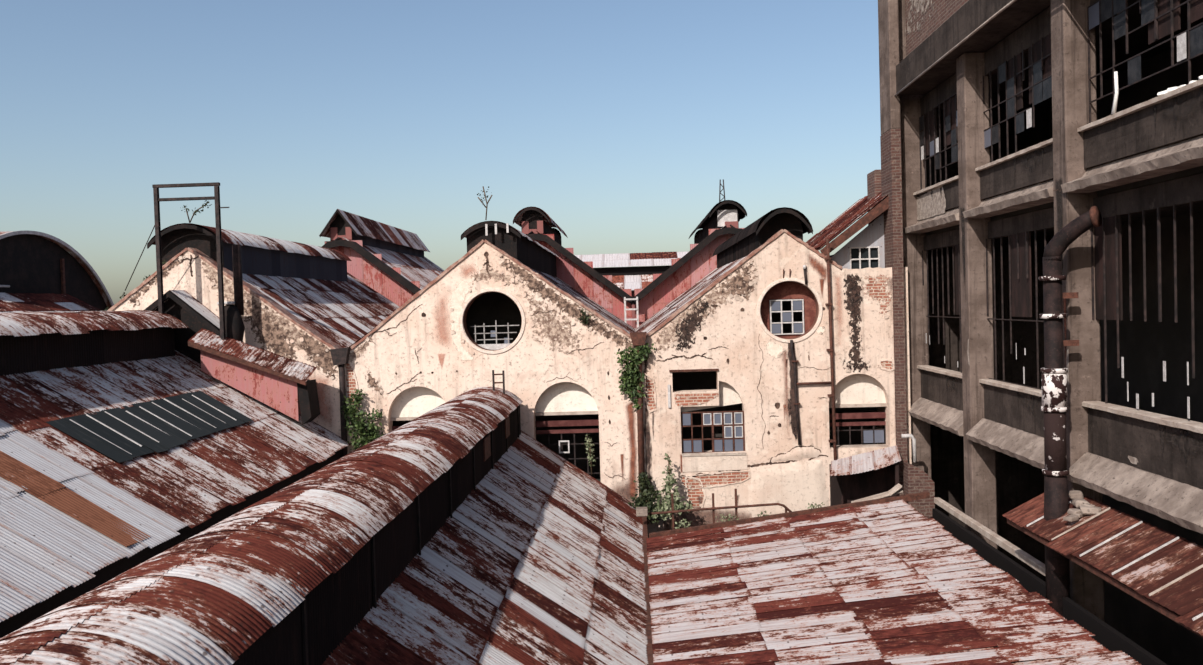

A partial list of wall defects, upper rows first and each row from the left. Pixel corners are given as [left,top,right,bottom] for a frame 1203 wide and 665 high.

mould [674,298,712,353]
leakage [843,274,863,372]
flaking render [861,274,892,319]
rust [0,451,150,547]
rust [621,403,636,497]
flaking render [679,471,751,509]